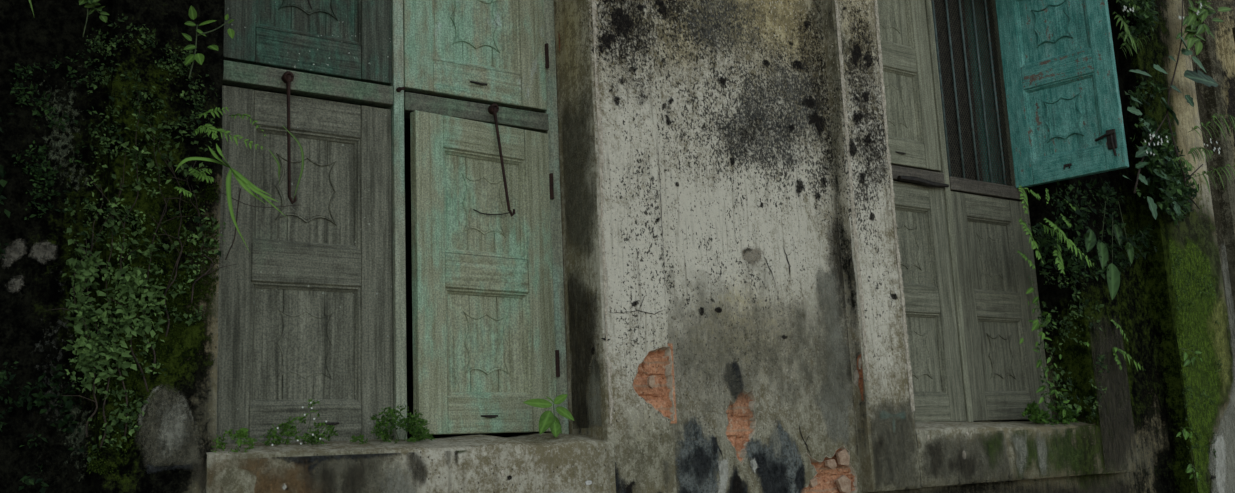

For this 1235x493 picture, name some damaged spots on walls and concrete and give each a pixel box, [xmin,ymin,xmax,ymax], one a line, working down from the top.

damp [595,0,834,200]
damp [841,0,890,202]
damp [273,452,427,493]
peeling [632,343,858,493]
damp [806,220,1136,493]
damp [1214,435,1226,493]